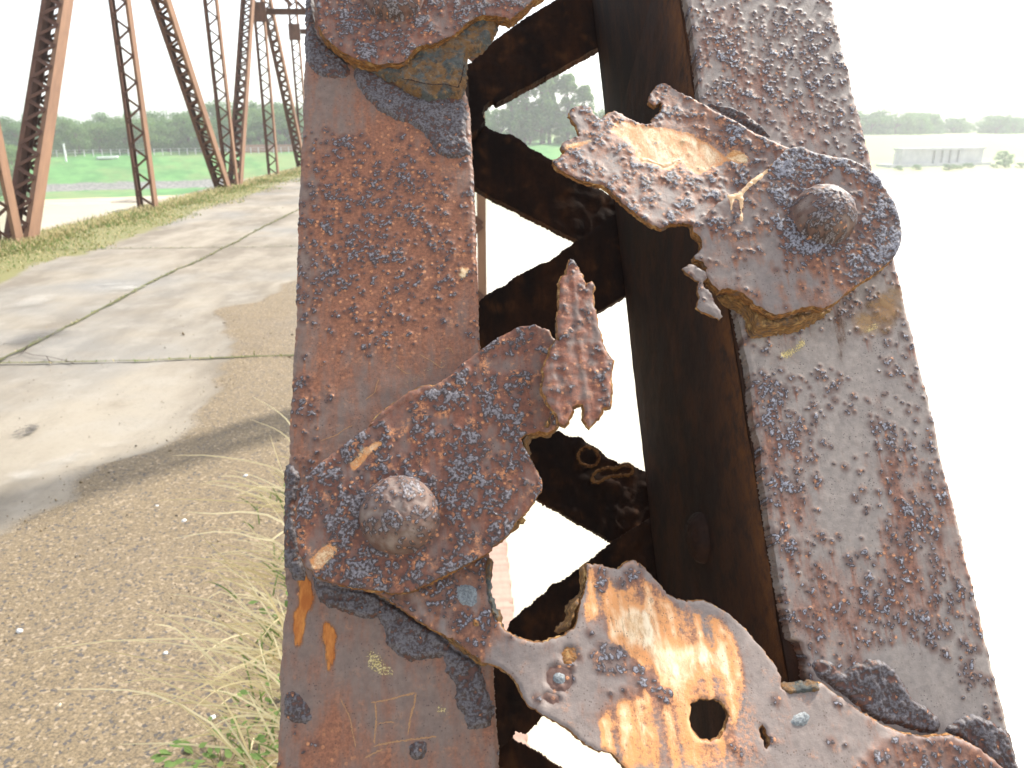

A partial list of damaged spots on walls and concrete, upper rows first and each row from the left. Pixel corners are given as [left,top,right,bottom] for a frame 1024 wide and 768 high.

rust [304,0,499,159]
peeling [619,124,747,165]
rust [708,104,770,137]
rust [681,264,844,356]
peeling [313,548,333,568]
rust [282,464,495,730]
spalling [457,585,477,606]
peeling [629,611,719,680]
hole [541,647,577,705]
spalling [791,712,810,726]
rust [781,659,1018,768]
rust [409,741,427,760]